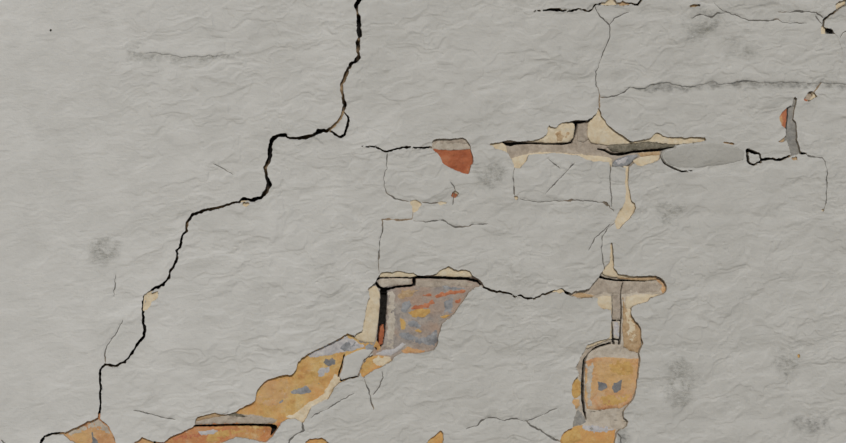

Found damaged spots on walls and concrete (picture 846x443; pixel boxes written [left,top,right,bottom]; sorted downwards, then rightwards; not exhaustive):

crack [537,0,641,109]
crack [98,0,362,413]
crack [362,146,486,270]
spalling [429,138,473,174]
spalling [490,109,705,229]
crack [746,149,828,208]
spalling [778,92,816,156]
spalling [60,413,116,443]
spalling [134,266,484,443]
crack [288,372,384,443]
crack [471,279,569,299]
spalling [560,243,665,443]